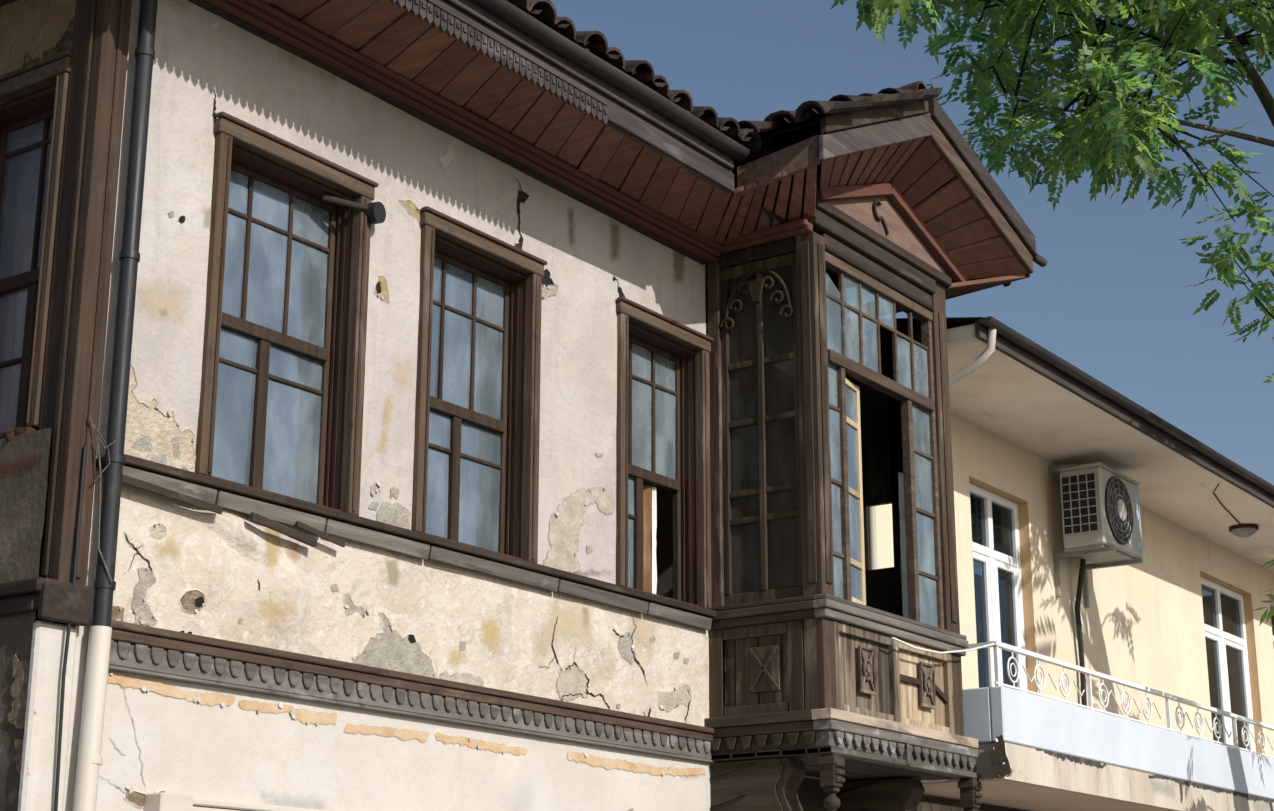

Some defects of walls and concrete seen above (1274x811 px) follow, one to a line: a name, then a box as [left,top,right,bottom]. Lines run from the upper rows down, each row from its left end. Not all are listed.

crack [515,179,529,250]
spalling [147,521,167,540]
peeling [543,487,615,573]
spalling [7,654,36,776]
peeling [112,567,157,626]
spalling [177,588,208,614]
peeling [107,672,527,756]
peeling [332,584,484,686]
peeling [557,666,590,701]
peeling [618,632,638,664]